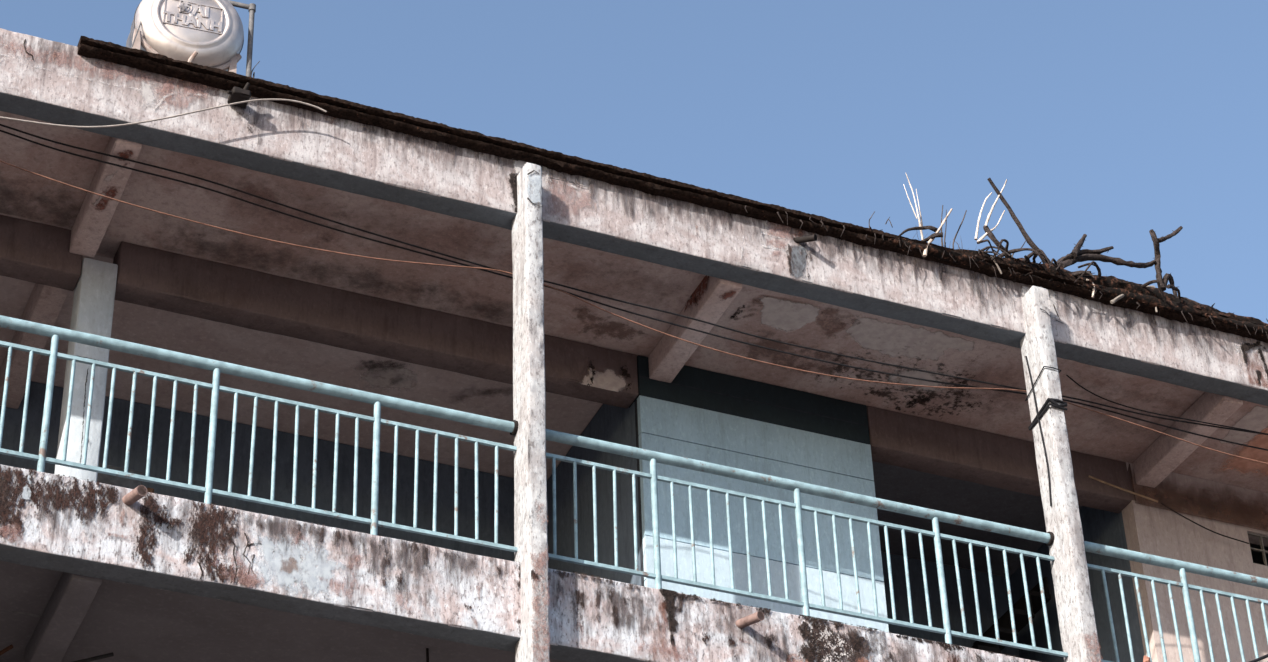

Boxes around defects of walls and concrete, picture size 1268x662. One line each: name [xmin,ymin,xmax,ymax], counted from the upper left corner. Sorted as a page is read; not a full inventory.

leakage [473,151,519,212]
leakage [786,229,954,286]
peeling [684,275,709,312]
peeling [722,291,974,360]
peeling [582,360,632,392]